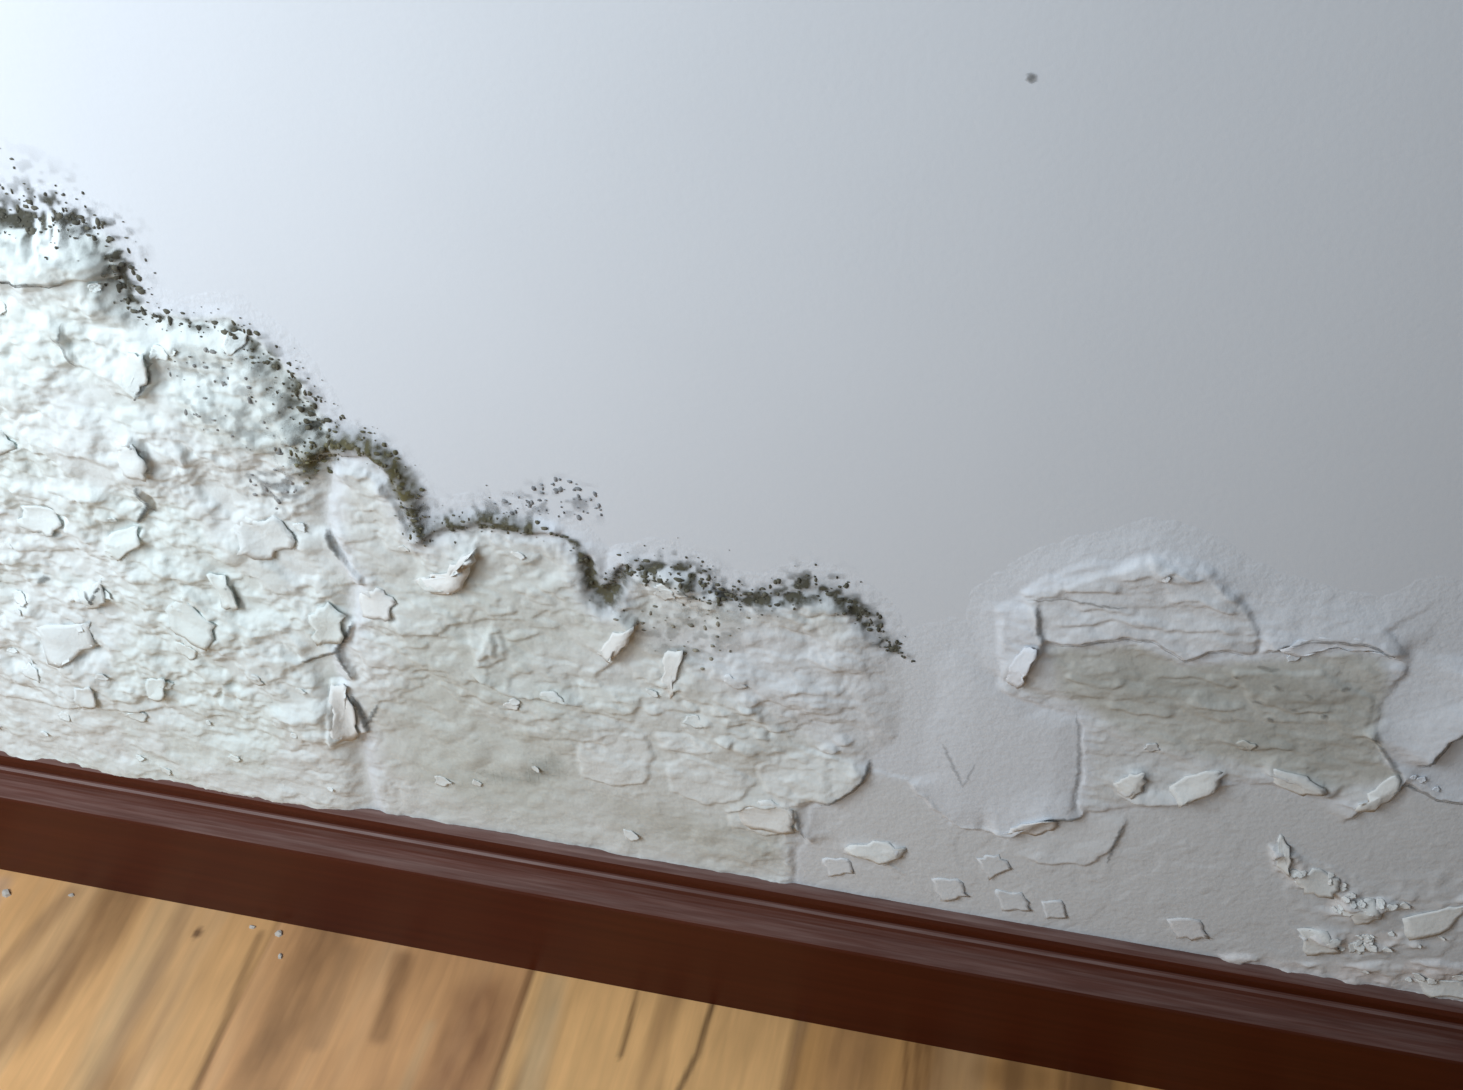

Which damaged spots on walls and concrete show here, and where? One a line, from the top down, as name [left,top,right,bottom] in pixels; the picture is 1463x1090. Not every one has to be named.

crack [131,449,155,522]
crack [307,626,377,729]
damp [0,148,915,671]
flaking render [0,181,1463,1002]